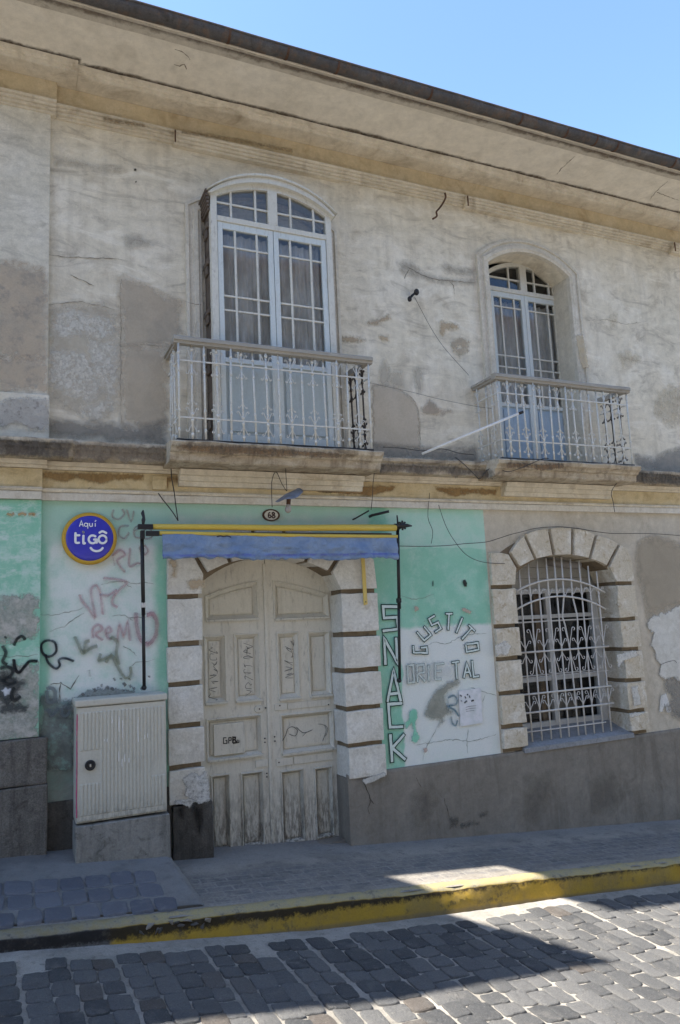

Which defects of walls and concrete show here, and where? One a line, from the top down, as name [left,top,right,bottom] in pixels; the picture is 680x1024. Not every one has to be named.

peeling [48,308,118,420]
peeling [648,605,680,681]
peeling [175,771,211,807]